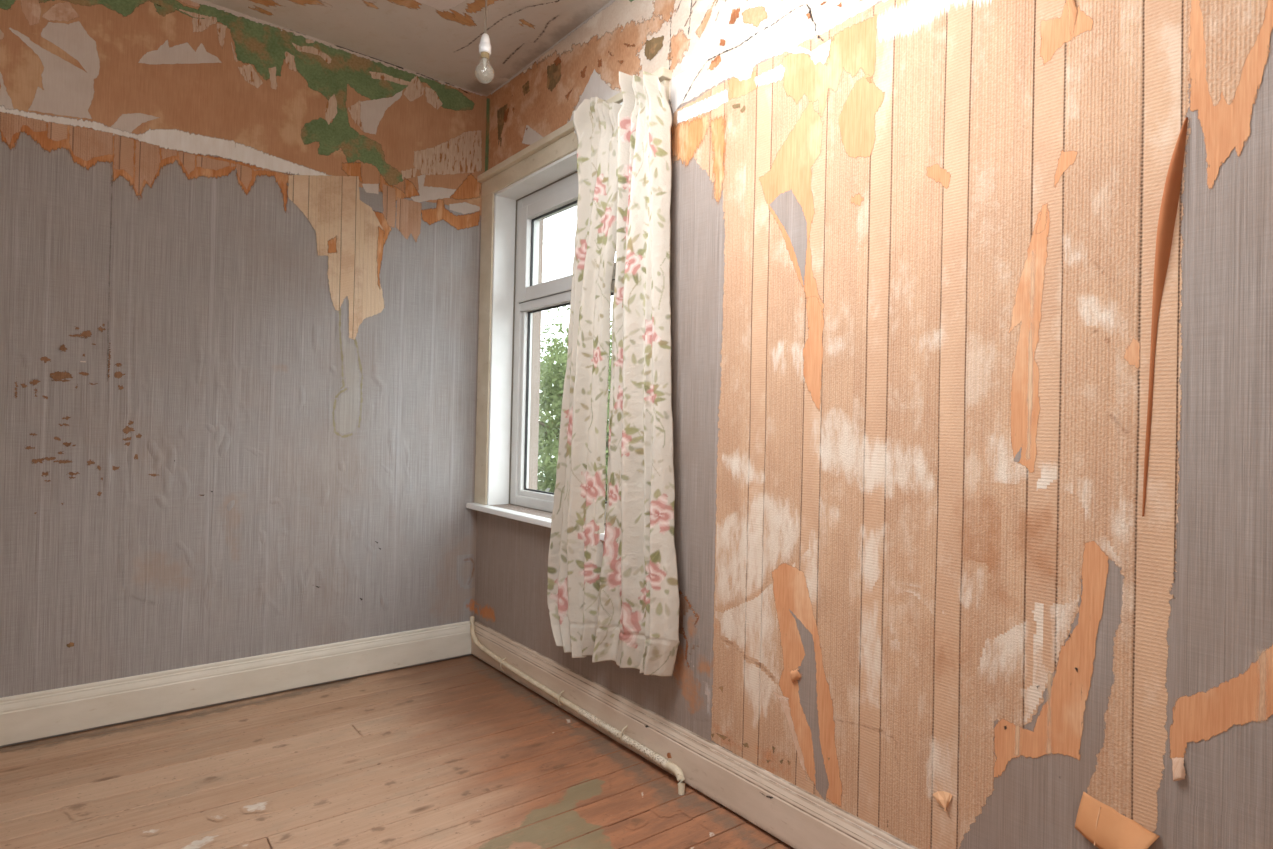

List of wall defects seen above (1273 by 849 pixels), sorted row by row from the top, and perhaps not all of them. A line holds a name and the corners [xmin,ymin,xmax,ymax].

flaking render [0,21,100,119]
flaking render [138,40,222,65]
crack [457,0,559,64]
flaking render [671,33,719,113]
flaking render [731,65,753,81]
crack [669,0,826,98]
flaking render [782,40,831,65]
flaking render [111,113,159,133]
flaking render [360,90,403,135]
flaking render [411,175,480,214]
peeling [15,324,125,399]
peeling [25,416,76,483]